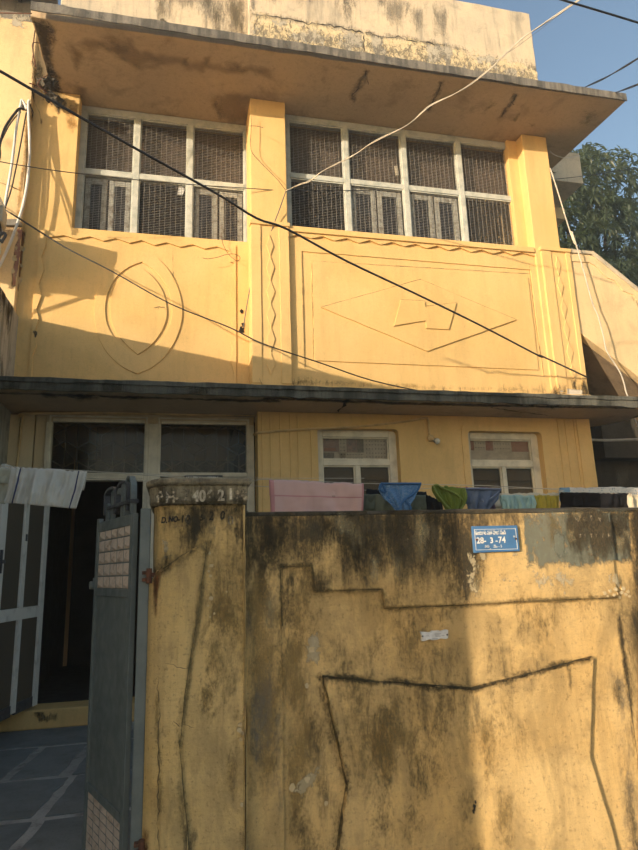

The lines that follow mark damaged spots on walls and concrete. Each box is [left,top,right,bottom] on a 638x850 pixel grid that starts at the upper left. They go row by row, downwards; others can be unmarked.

damp [206,0,246,33]
crack [252,13,459,100]
peeling [250,12,538,80]
damp [423,512,478,600]
damp [160,489,328,818]
damp [618,618,632,710]